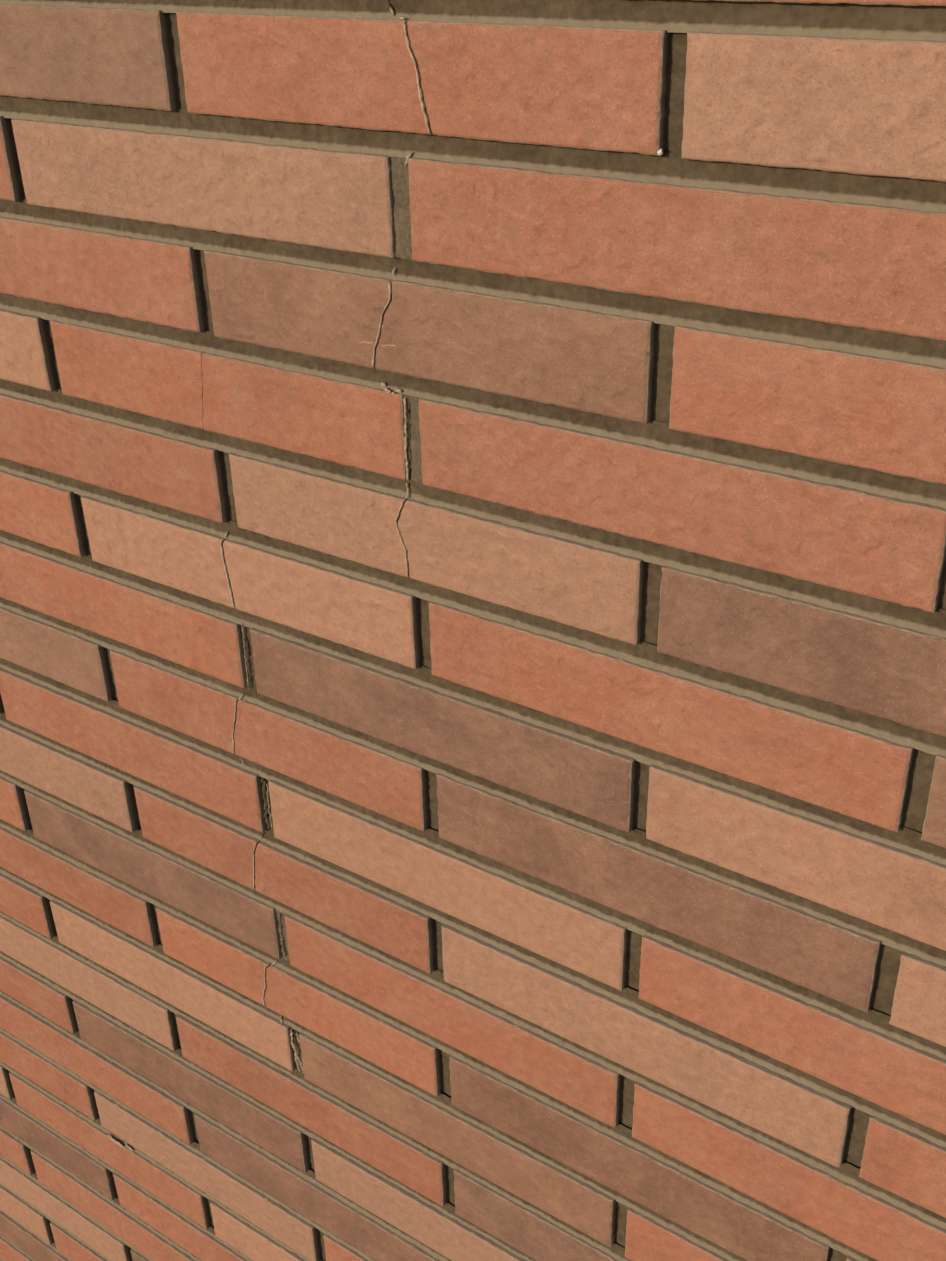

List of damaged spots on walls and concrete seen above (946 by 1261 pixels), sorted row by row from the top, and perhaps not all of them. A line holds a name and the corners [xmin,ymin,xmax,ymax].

crack [372,0,432,368]
crack [198,355,206,428]
crack [395,395,423,577]
crack [220,532,290,1024]